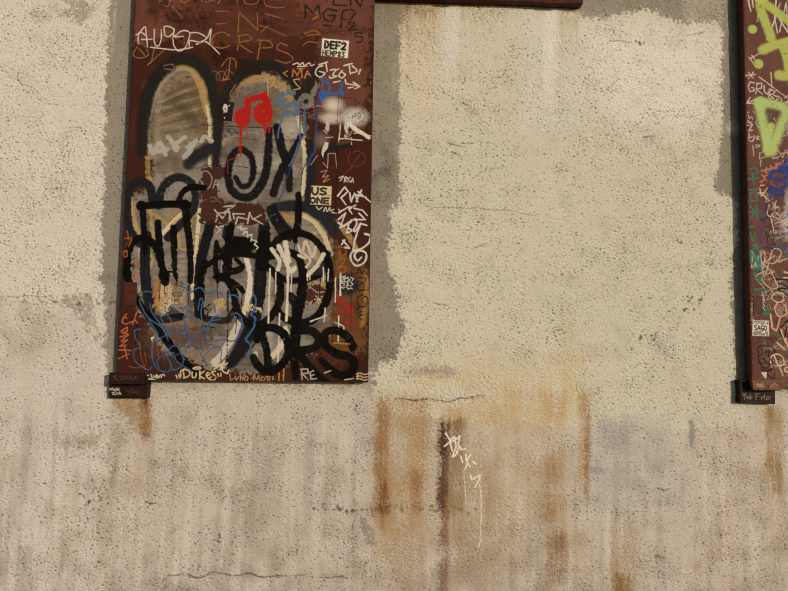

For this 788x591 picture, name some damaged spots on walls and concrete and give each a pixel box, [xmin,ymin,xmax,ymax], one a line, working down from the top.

corrosion [374,2,514,77]
corrosion [553,9,583,72]
corrosion [103,389,158,528]
corrosion [362,301,645,591]
corrosion [760,403,788,591]